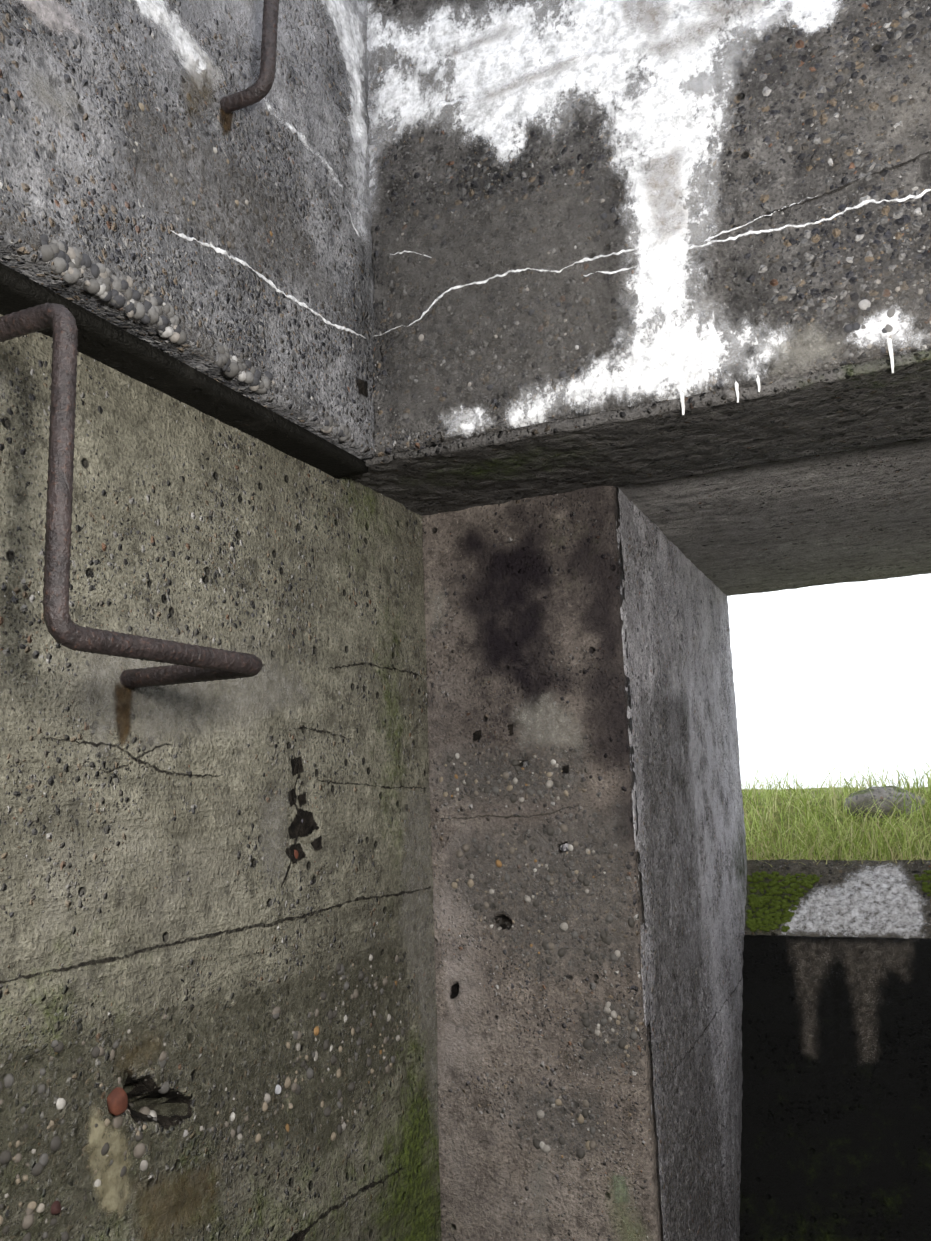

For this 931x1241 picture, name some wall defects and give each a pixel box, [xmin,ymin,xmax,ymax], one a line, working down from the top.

corrosion [220,109,232,132]
crack [437,98,468,109]
crack [267,105,360,237]
crack [171,151,931,339]
leakage [322,0,840,427]
leakage [855,310,909,346]
leakage [454,408,483,434]
corrosion [115,685,132,746]
spalling [0,953,408,1241]
crack [287,1168,402,1241]